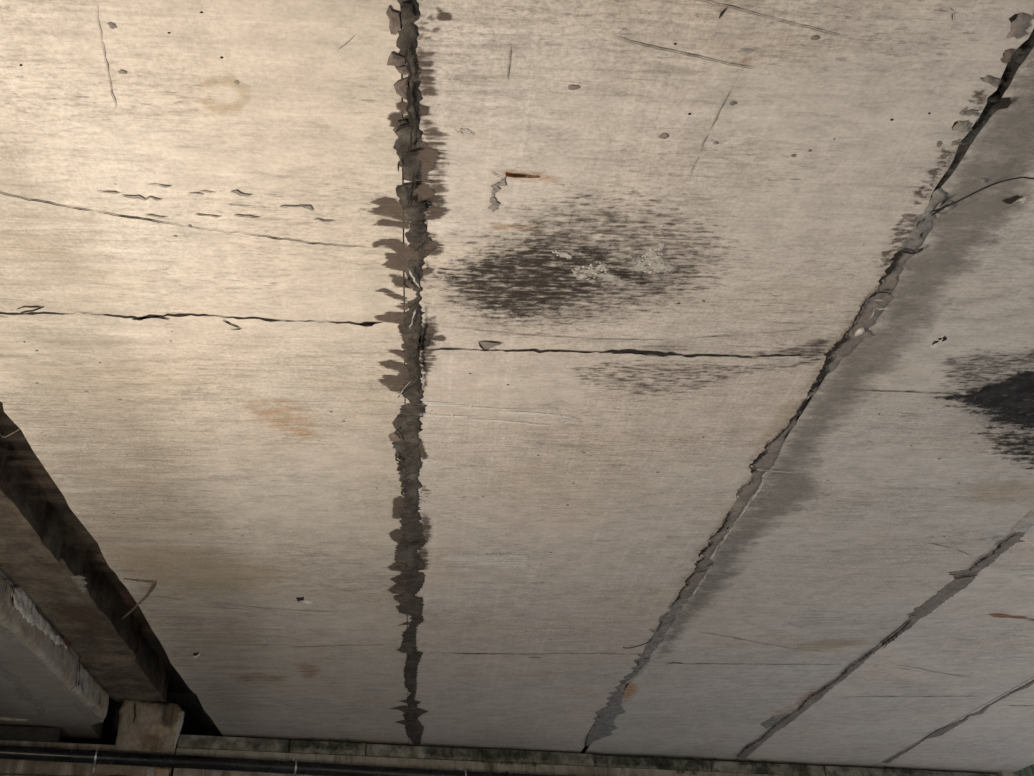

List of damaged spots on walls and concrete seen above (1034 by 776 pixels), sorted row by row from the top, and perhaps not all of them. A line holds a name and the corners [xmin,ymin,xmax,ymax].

crack [97,21,116,109]
crack [998,101,1012,110]
crack [0,306,383,330]
crack [395,38,950,631]
water stain [667,80,1034,641]
crack [950,534,1015,579]
crack [701,614,916,757]
crack [883,682,1034,763]